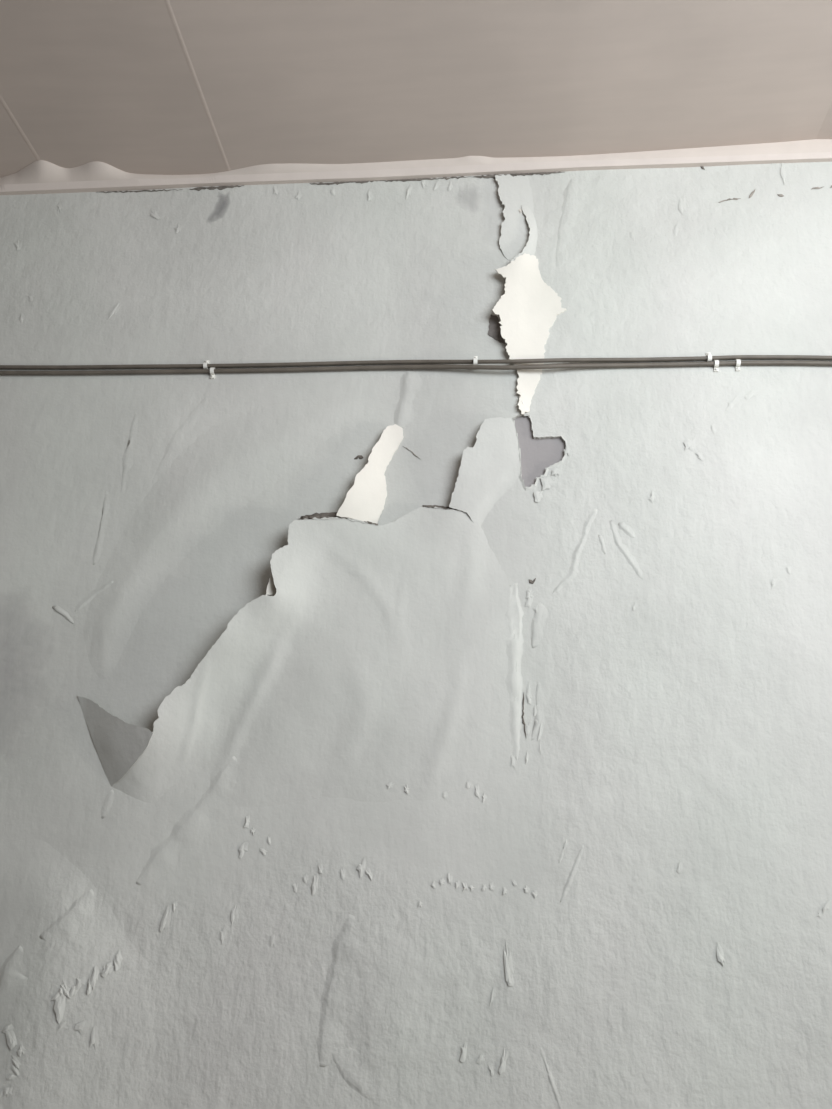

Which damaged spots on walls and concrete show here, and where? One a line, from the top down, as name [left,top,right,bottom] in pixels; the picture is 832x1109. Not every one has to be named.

peeling [78,174,571,885]
peeling [51,950,123,1050]